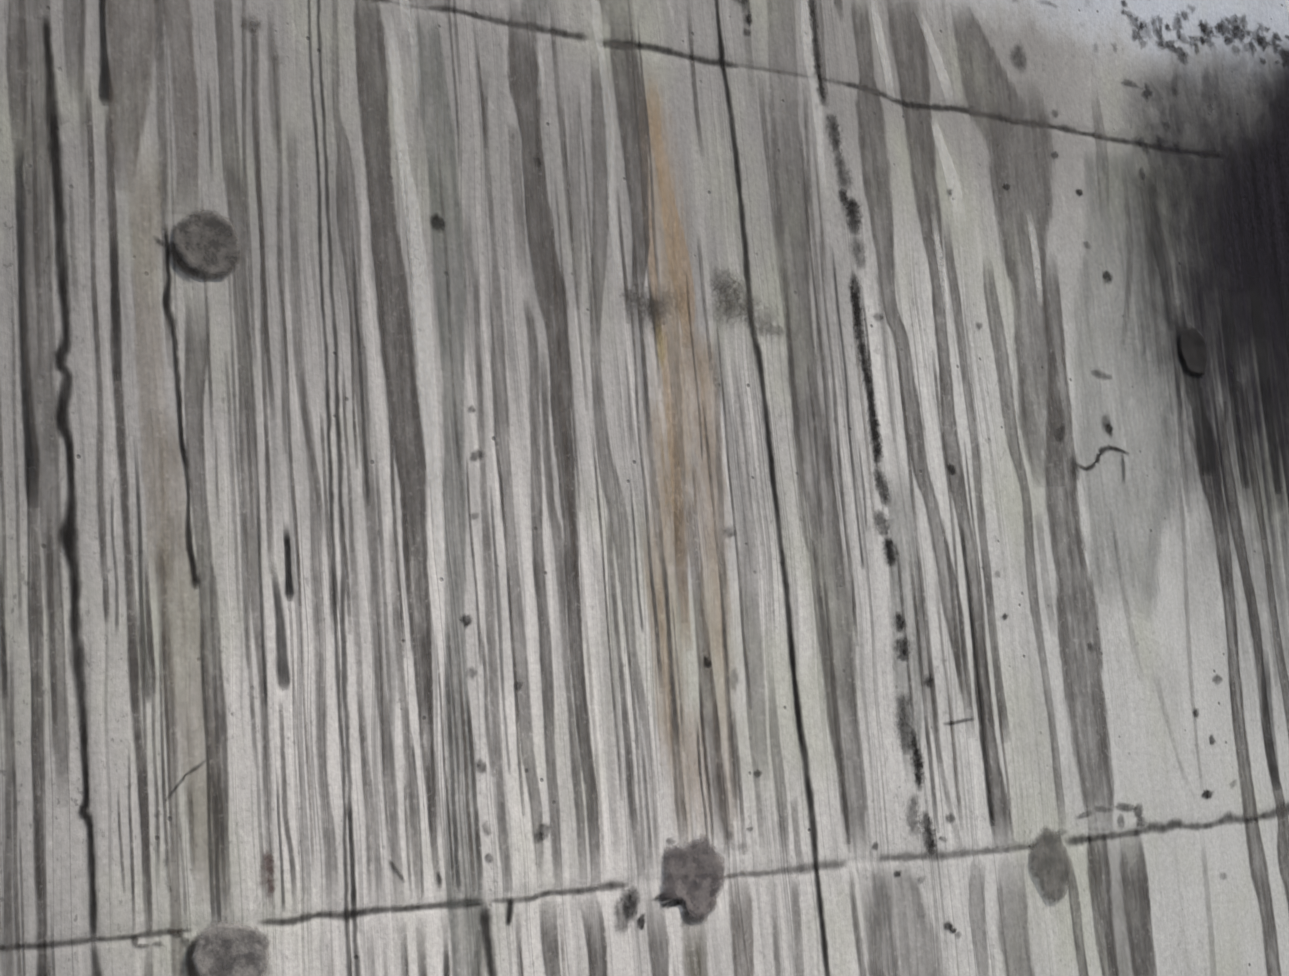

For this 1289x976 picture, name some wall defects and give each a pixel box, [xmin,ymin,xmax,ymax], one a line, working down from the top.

crack [0,22,184,976]
crack [158,232,199,586]
crack [267,0,625,976]
crack [442,0,830,976]
crack [896,614,943,856]
crack [809,0,1162,564]
crack [1072,805,1289,844]
water stain [1143,53,1289,976]